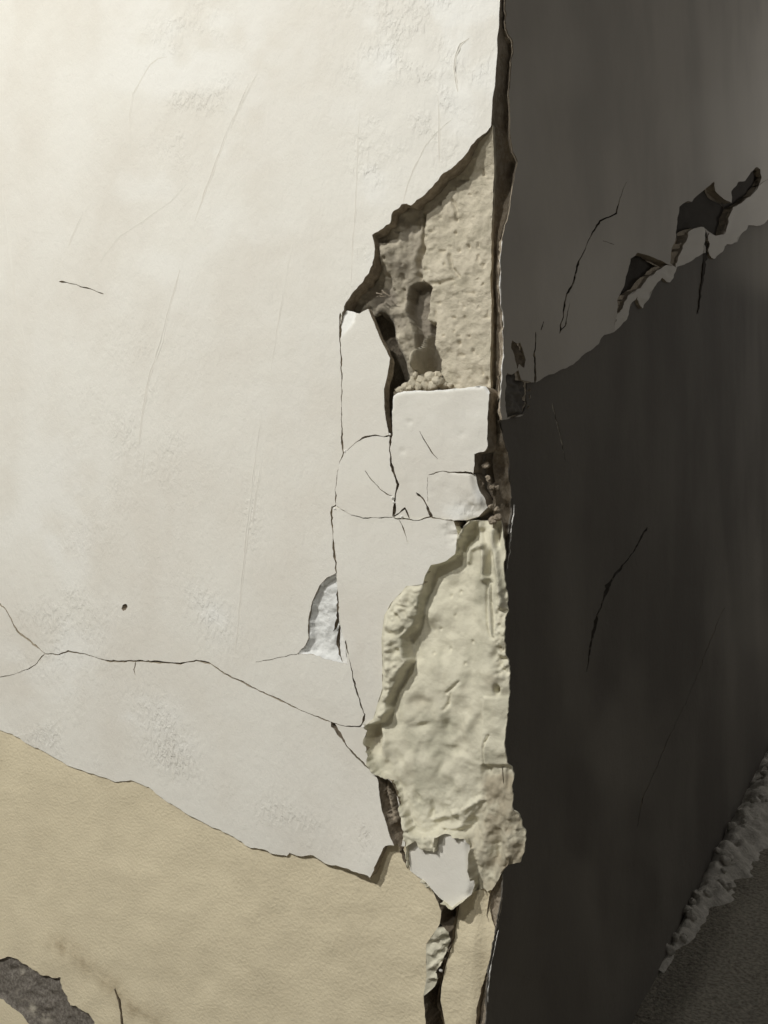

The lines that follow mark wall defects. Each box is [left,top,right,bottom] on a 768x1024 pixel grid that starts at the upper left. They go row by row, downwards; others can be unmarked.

flaking render [335,0,516,518]
crack [532,194,622,383]
crack [0,313,474,869]
flaking render [0,413,527,1024]
crack [424,892,461,1024]
crack [588,528,647,661]
peeling [484,171,768,1024]